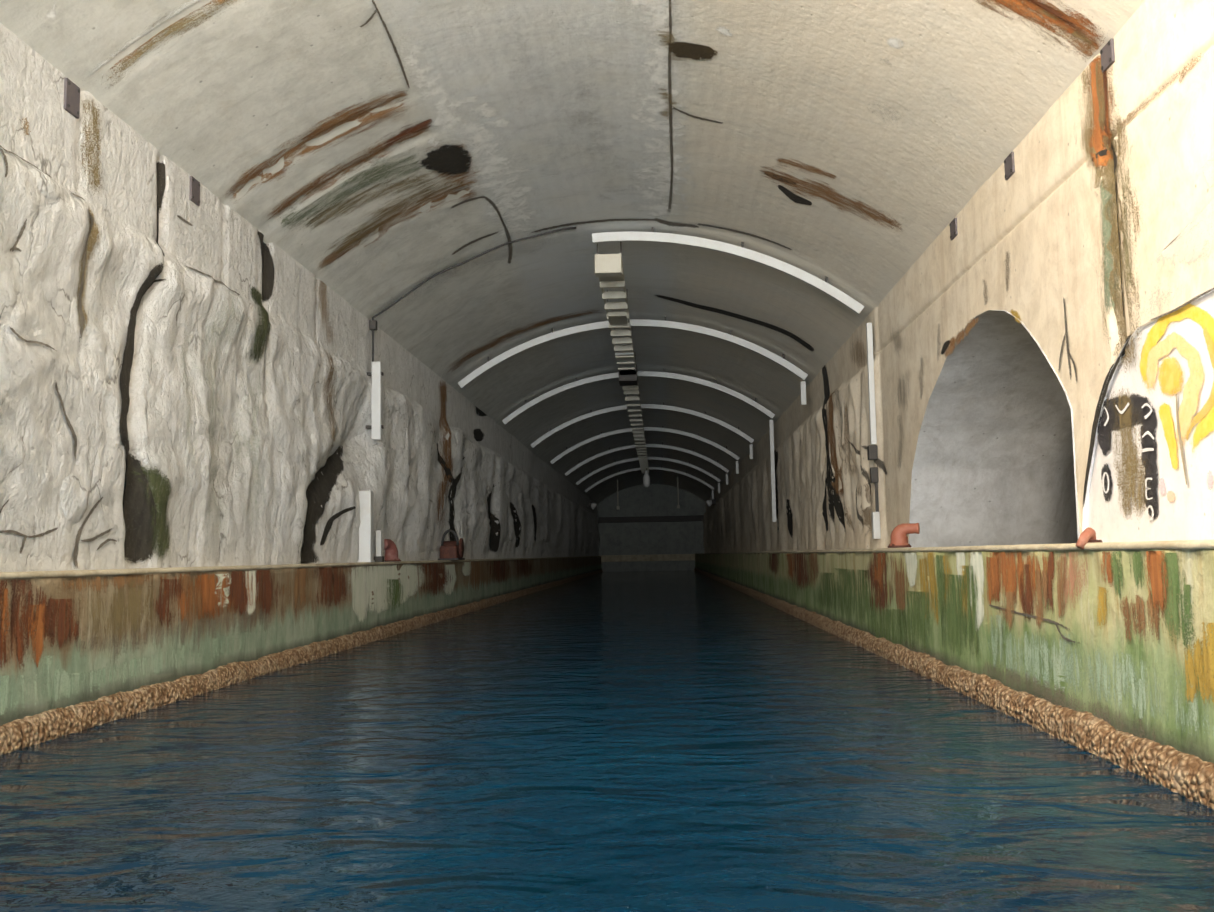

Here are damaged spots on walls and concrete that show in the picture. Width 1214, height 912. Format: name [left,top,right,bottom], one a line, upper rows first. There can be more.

crack [360,0,410,88]
spalling [420,137,481,194]
damp [225,0,699,451]
crack [451,0,792,263]
spalling [656,23,718,65]
corrosion [760,158,902,230]
corrosion [974,0,1120,173]
damp [1089,115,1152,520]
crack [655,295,887,537]
corrosion [0,580,81,672]
corrosion [149,567,349,628]
corrosion [984,551,1171,644]